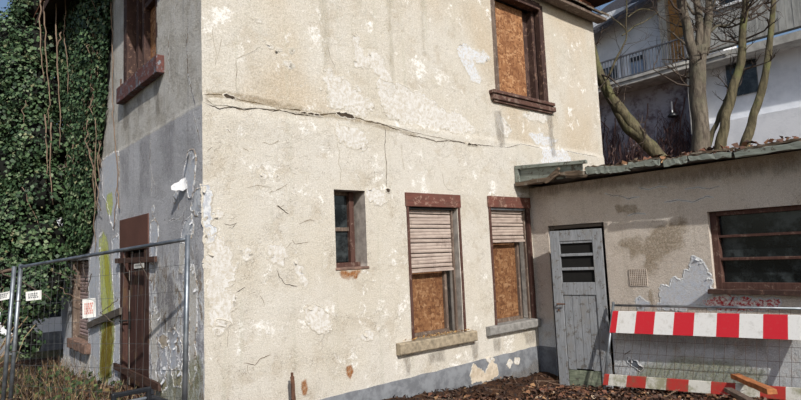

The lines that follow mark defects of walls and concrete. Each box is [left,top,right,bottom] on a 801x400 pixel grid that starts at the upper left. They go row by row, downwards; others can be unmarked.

peeling [456,42,491,85]
crack [168,25,597,194]
crack [246,184,316,248]
water stain [98,234,114,383]
peeling [150,148,255,393]
peeling [635,255,782,314]
flaking render [470,356,520,385]